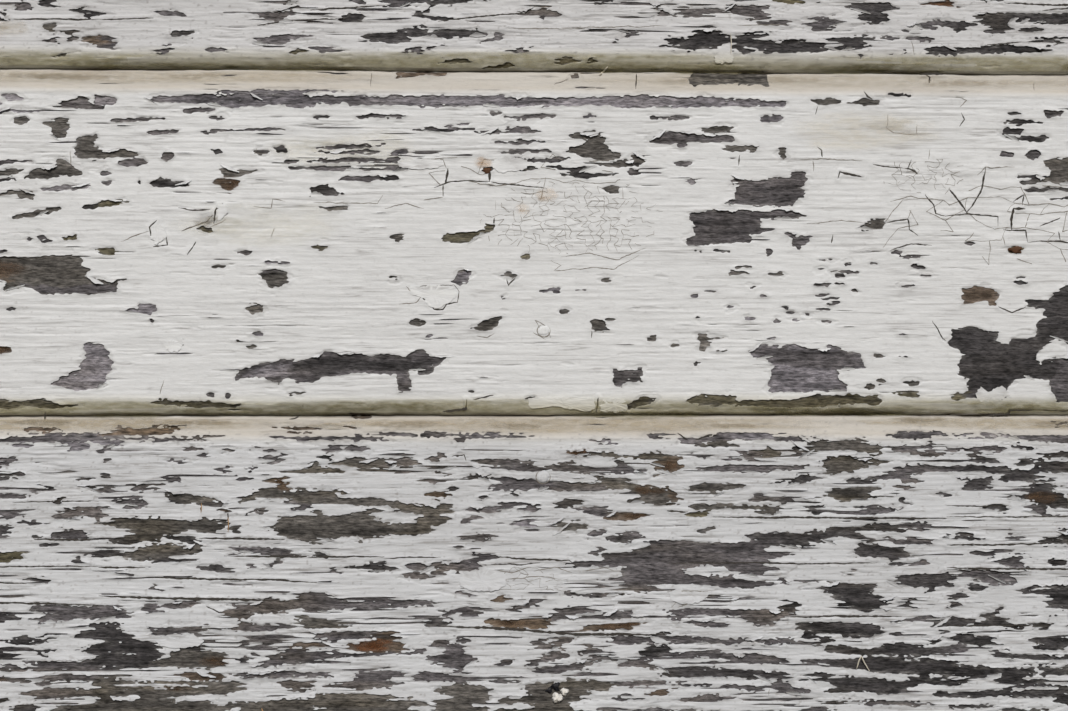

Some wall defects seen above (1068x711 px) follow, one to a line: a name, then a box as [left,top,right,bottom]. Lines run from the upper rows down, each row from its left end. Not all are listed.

peeling [0,83,179,219]
peeling [138,0,1068,211]
peeling [0,234,127,295]
peeling [258,260,290,288]
peeling [441,223,495,244]
peeling [686,171,813,257]
peeling [51,342,114,391]
peeling [223,268,502,396]
peeling [525,367,656,425]
peeling [686,317,920,408]
peeling [948,285,1068,403]
peeling [0,412,1068,711]